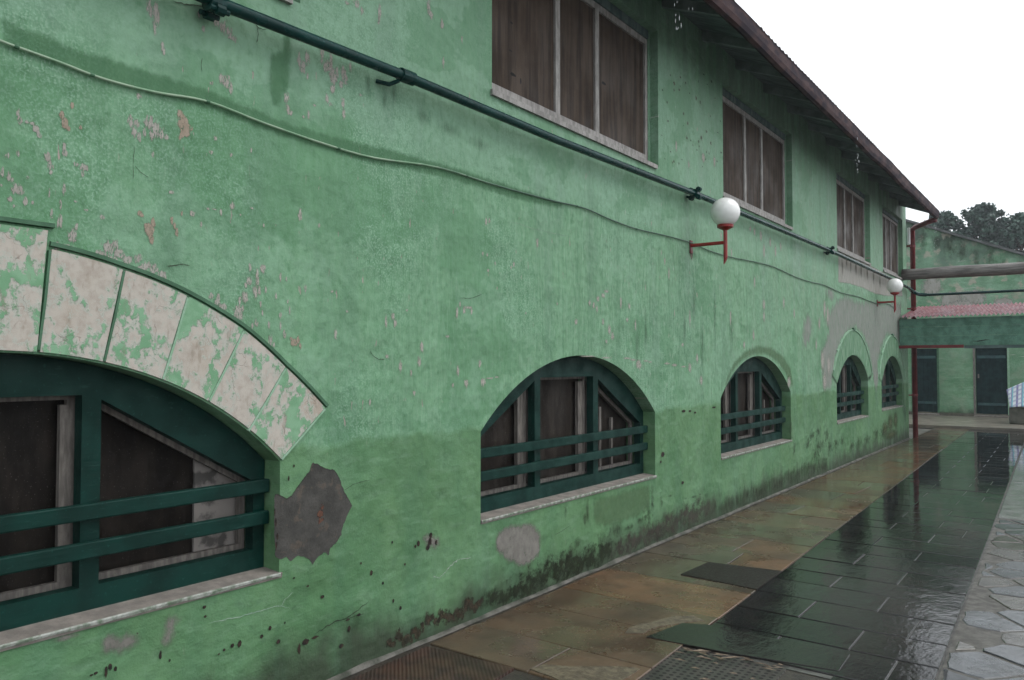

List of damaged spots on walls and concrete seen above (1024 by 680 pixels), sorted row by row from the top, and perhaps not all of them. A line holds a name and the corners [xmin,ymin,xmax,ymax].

peeling [127,109,193,157]
peeling [0,151,34,208]
peeling [49,184,88,250]
peeling [95,240,166,279]
peeling [209,264,301,349]
spalling [274,463,352,565]
flaking render [496,524,540,566]
water stain [386,543,610,648]